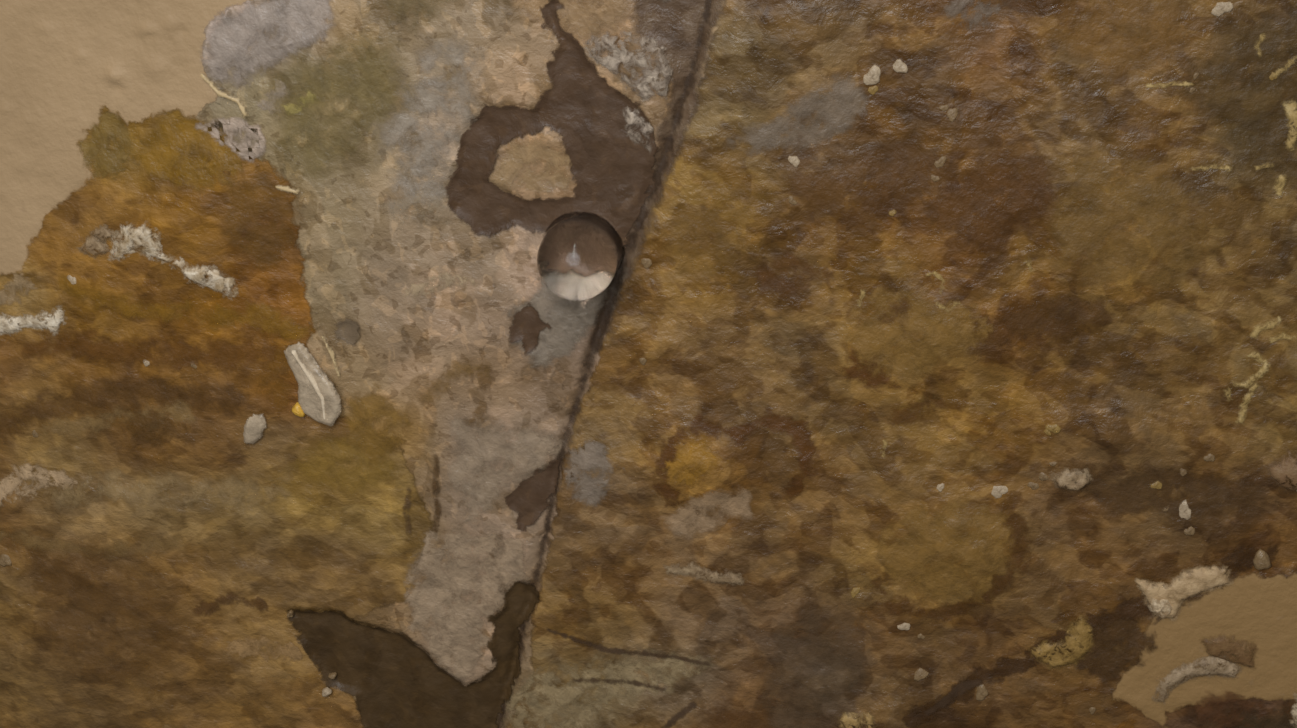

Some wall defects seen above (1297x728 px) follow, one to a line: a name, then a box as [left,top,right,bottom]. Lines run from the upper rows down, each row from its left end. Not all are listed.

damp [0,106,435,728]
peeling [196,0,707,728]
crack [497,620,708,728]
crack [531,0,722,586]
damp [507,0,1297,728]